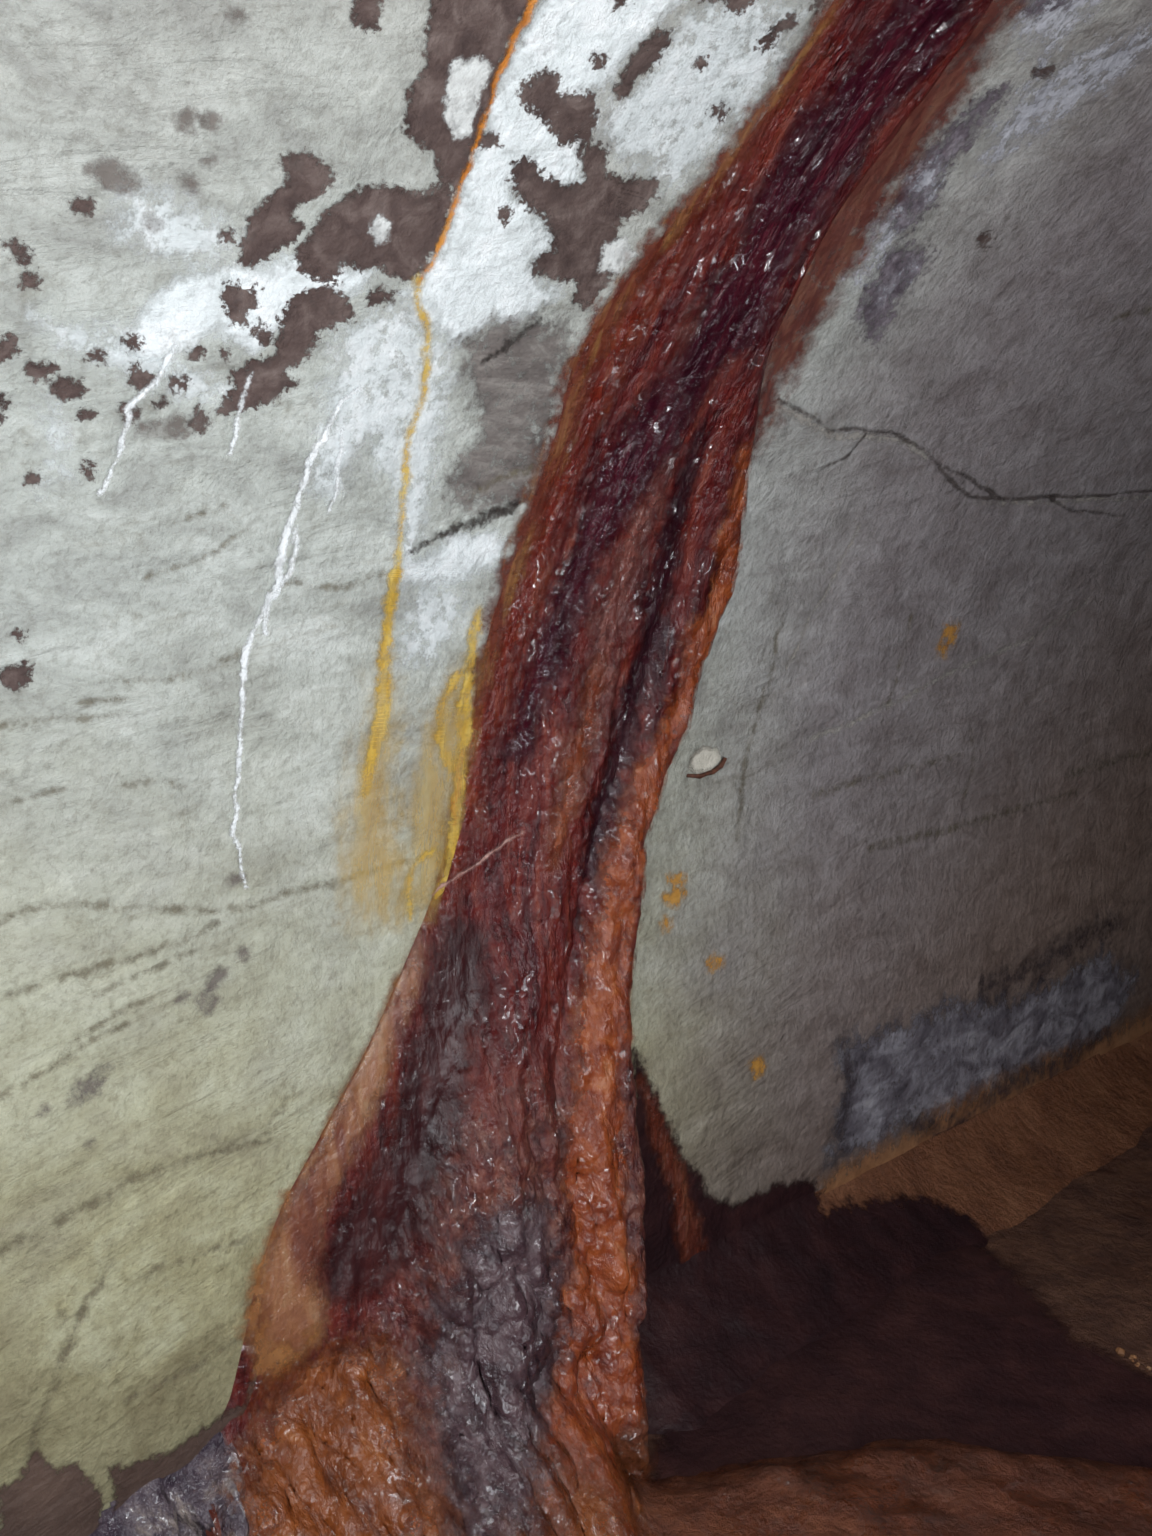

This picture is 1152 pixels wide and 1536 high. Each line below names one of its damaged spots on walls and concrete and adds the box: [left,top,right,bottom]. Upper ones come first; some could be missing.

peeling [691,55,710,73]
peeling [705,102,731,124]
damp [48,190,372,402]
peeling [0,0,673,439]
damp [315,0,806,665]
peeling [23,471,41,486]
peeling [79,459,99,482]
crack [778,398,1152,516]
corrosion [205,0,1022,1536]
damp [632,1008,1152,1435]